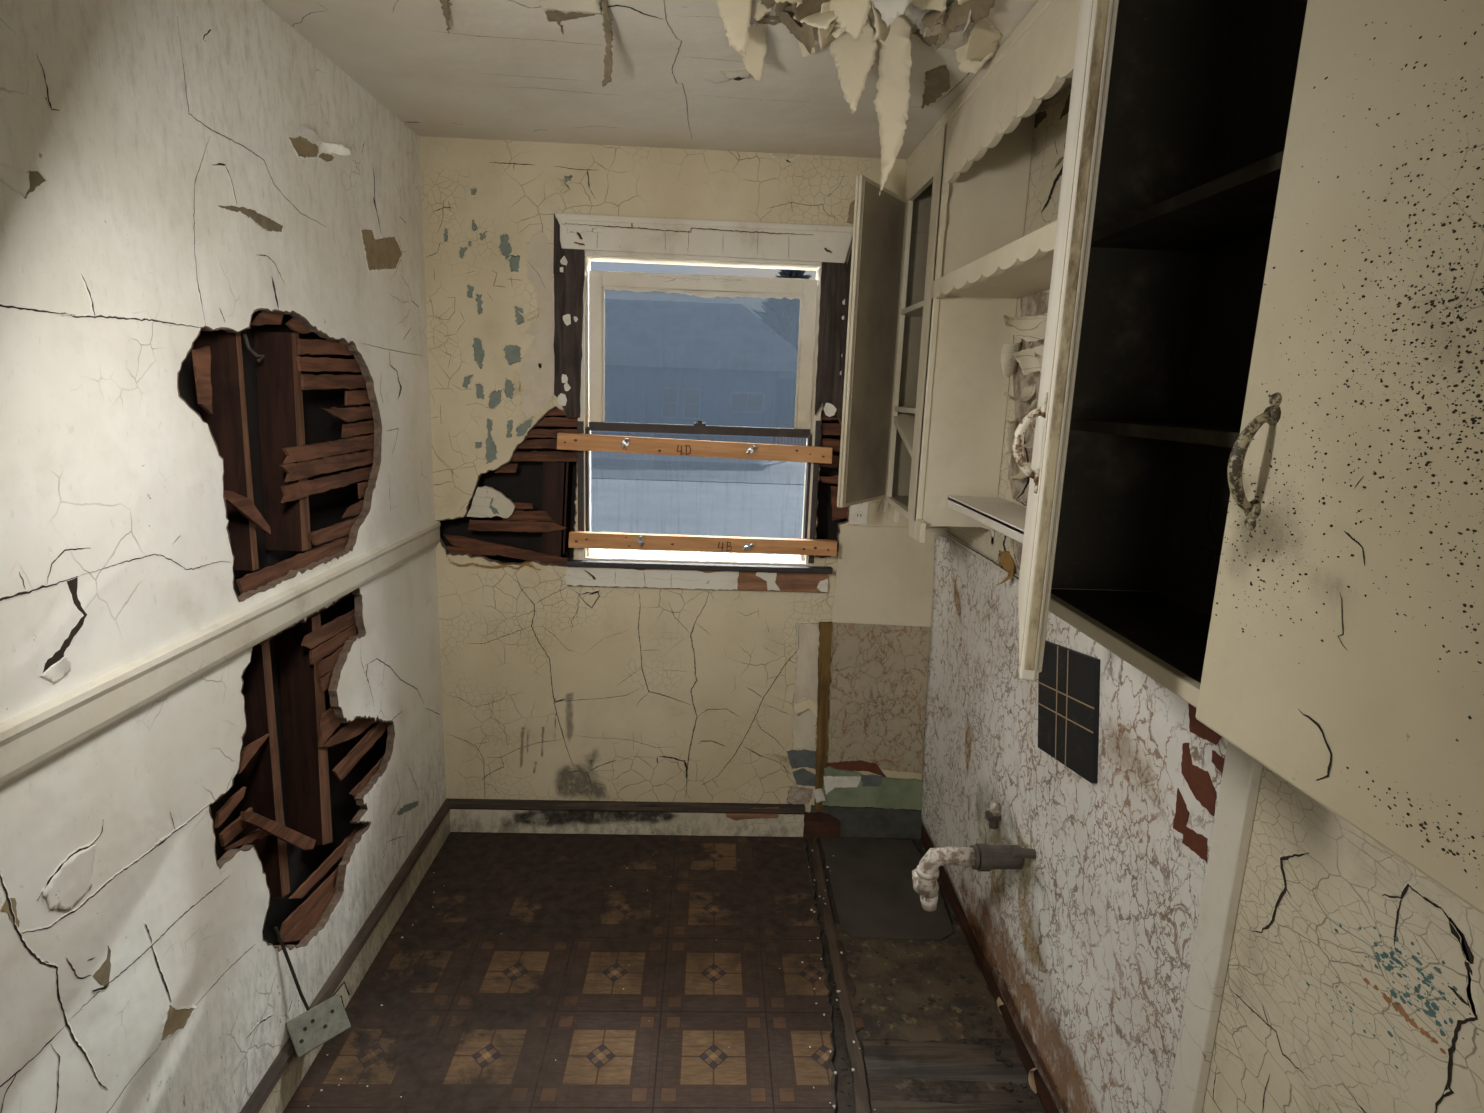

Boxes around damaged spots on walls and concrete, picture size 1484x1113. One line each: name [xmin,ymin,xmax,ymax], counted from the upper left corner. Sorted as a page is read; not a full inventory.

peeling [714,0,1003,196]
crack [0,536,231,603]
hole [177,308,382,602]
spalling [209,588,395,952]
spalling [436,217,578,567]
crack [361,566,799,798]
damp [515,754,674,826]
peeling [1001,290,1050,505]
crack [1252,850,1309,933]
mould [1215,69,1484,673]
mould [1346,767,1484,889]
crack [1381,881,1481,1113]